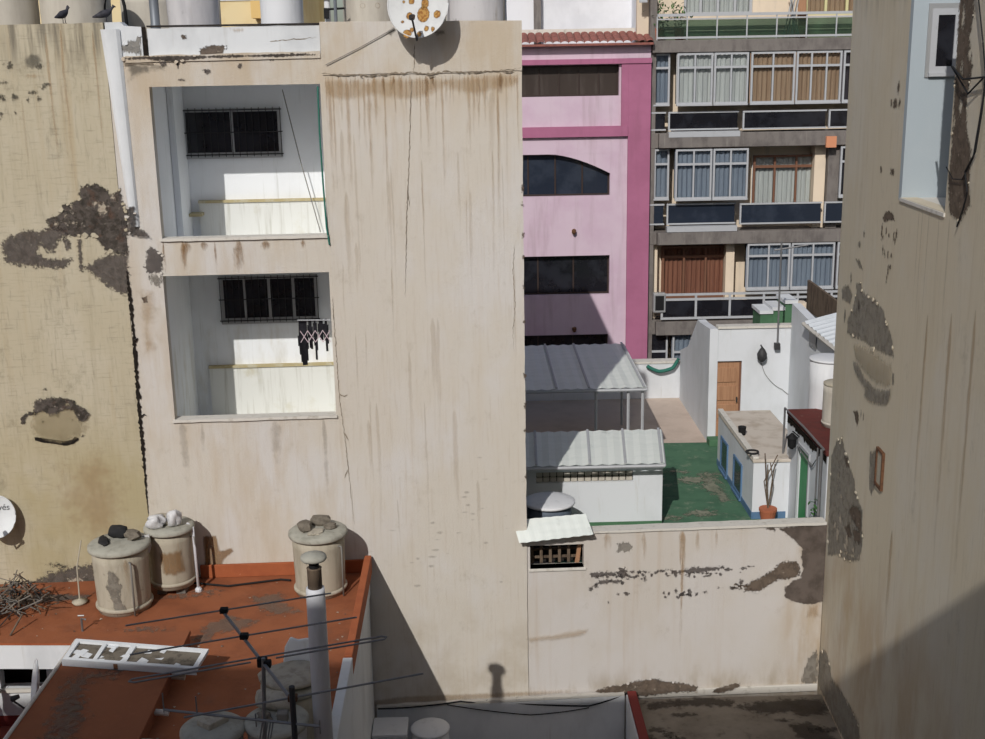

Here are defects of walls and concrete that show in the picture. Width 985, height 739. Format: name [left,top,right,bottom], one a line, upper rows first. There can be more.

flaking render [1,183,164,294]
crack [322,46,514,291]
flaking render [948,0,975,222]
flaking render [842,276,894,356]
crack [126,271,148,509]
flaking render [787,416,863,562]
flaking render [589,560,800,596]
flaking render [801,649,860,739]